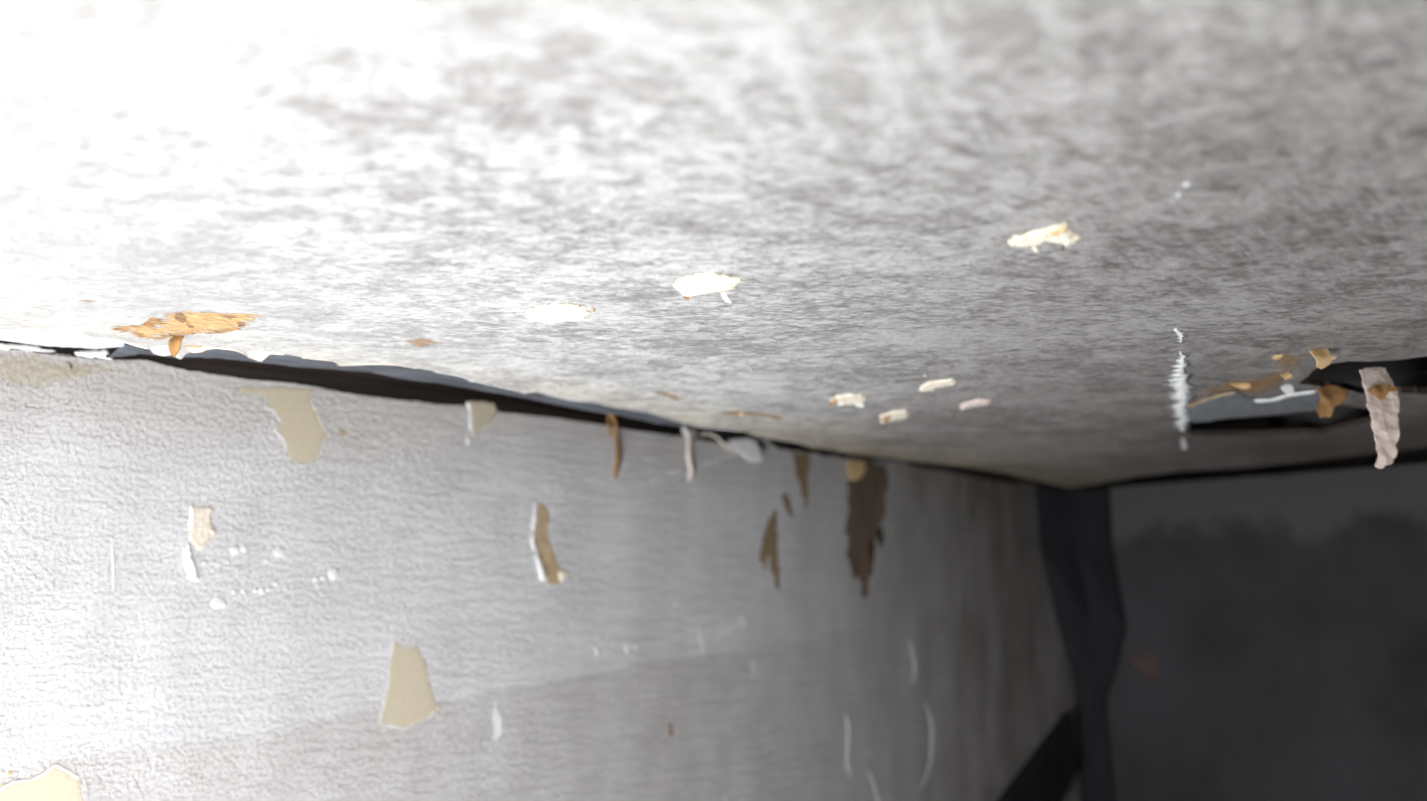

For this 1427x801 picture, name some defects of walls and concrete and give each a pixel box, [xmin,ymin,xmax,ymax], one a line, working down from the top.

peeling [1008,222,1081,253]
peeling [524,303,596,323]
peeling [670,272,741,303]
peeling [235,386,344,464]
peeling [606,414,622,479]
peeling [847,459,866,480]
spalling [1184,349,1427,469]
peeling [183,505,216,582]
peeling [531,502,569,585]
peeling [380,641,440,729]
peeling [0,763,83,801]